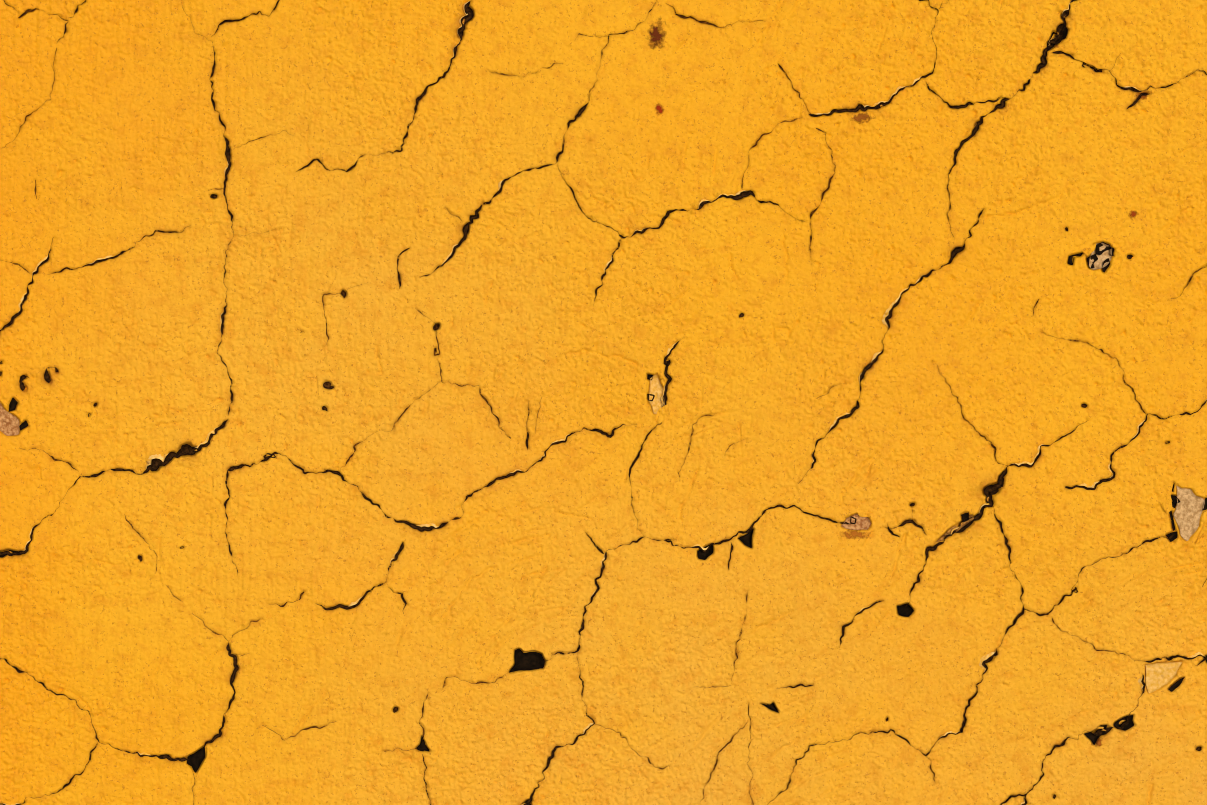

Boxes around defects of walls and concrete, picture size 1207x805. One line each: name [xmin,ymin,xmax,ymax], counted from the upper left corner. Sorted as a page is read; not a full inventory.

crack [296,1,474,172]
crack [0,0,291,556]
flaking render [1068,242,1133,273]
crack [322,282,368,340]
flaking render [0,375,29,436]
crack [384,0,1207,805]
flaking render [841,512,873,530]
flaking render [1158,482,1207,544]
crack [0,308,625,805]
spalling [509,649,545,673]
flaking render [1145,662,1185,693]